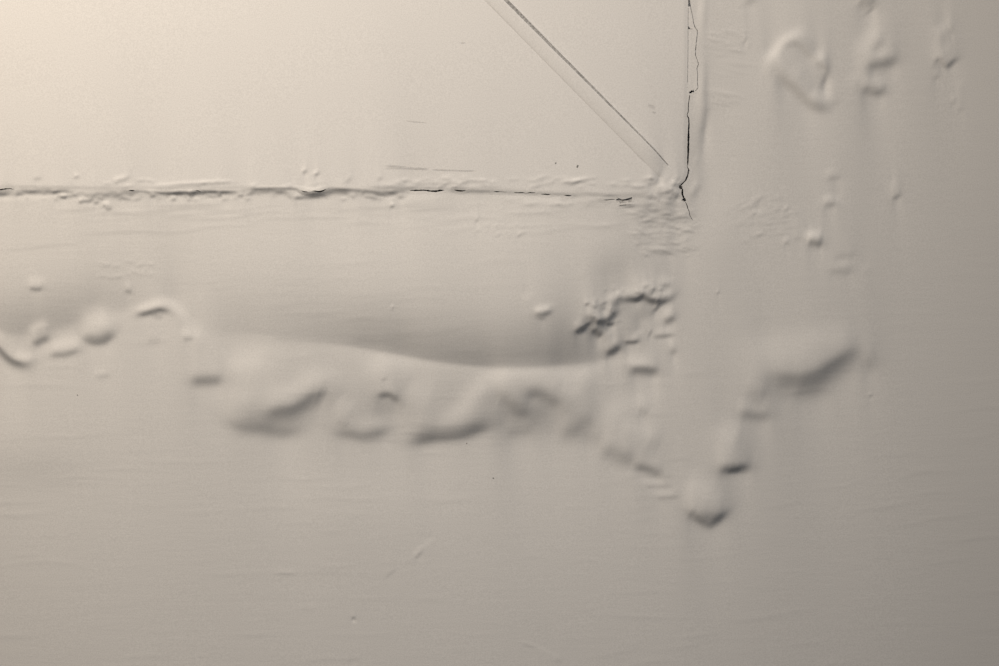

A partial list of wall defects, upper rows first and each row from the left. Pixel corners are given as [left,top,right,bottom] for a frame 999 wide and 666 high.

crack [677,90,697,225]
crack [0,185,17,193]
crack [298,185,330,195]
crack [407,187,575,199]